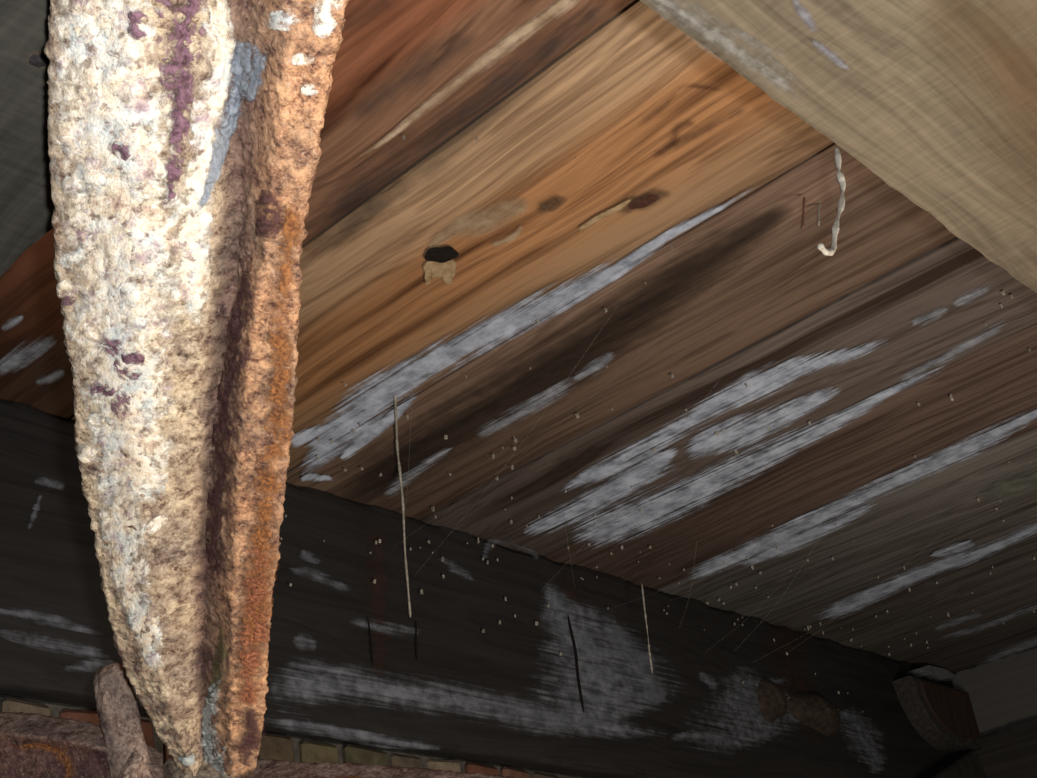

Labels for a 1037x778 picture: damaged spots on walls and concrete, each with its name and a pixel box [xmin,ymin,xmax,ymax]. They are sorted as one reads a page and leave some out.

damp [292,191,781,494]
damp [913,288,988,325]
rust [204,190,302,766]
damp [525,326,1001,547]
damp [691,410,1037,579]
damp [293,551,347,590]
damp [817,522,1037,619]
damp [282,588,674,736]
damp [936,605,1037,637]
damp [277,720,431,749]
damp [675,673,798,751]
damp [839,712,883,773]